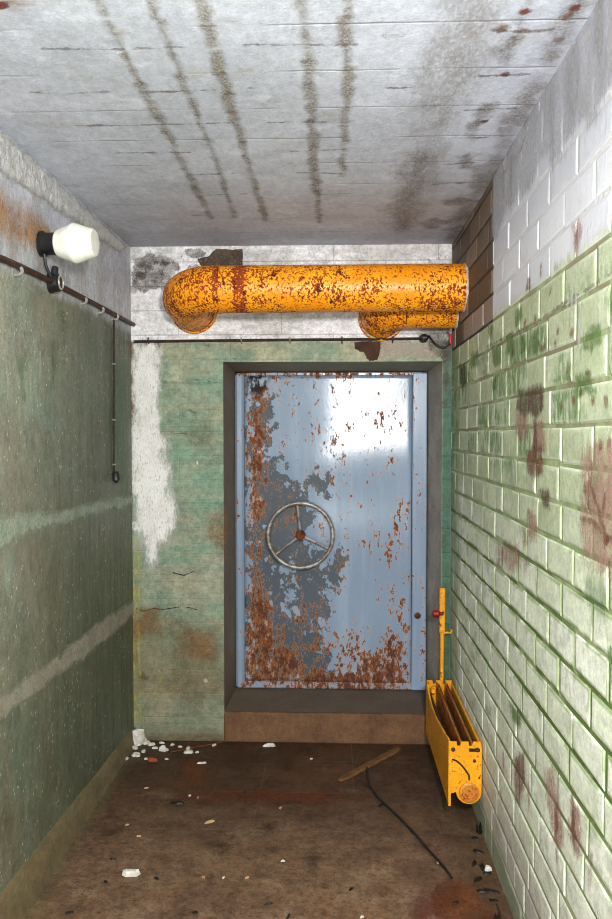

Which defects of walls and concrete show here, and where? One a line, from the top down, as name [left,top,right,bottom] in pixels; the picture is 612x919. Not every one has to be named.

water stain [339,7,351,45]
water stain [212,52,245,146]
water stain [477,0,612,235]
corrosion [0,197,49,246]
water stain [131,343,178,567]
corrosion [516,383,544,479]
corrosion [581,440,612,574]
corrosion [502,753,529,807]
corrosion [546,770,580,854]